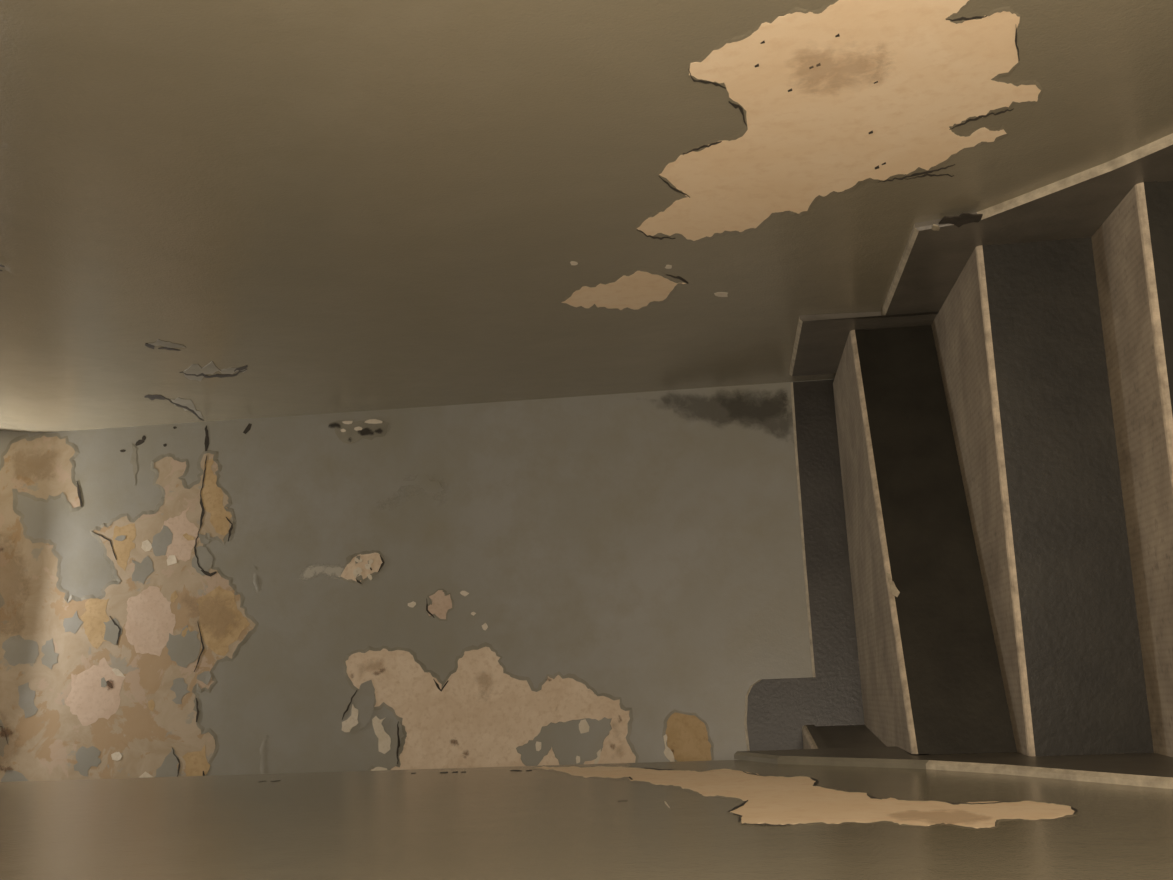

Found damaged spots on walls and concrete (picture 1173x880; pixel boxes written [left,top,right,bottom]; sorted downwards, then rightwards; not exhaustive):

peeling [634,0,1044,244]
peeling [560,265,688,313]
peeling [144,395,204,421]
spalling [329,419,389,444]
crack [194,425,217,577]
peeling [301,550,385,586]
peeling [0,432,259,782]
peeling [408,589,469,621]
peeling [342,612,1078,830]